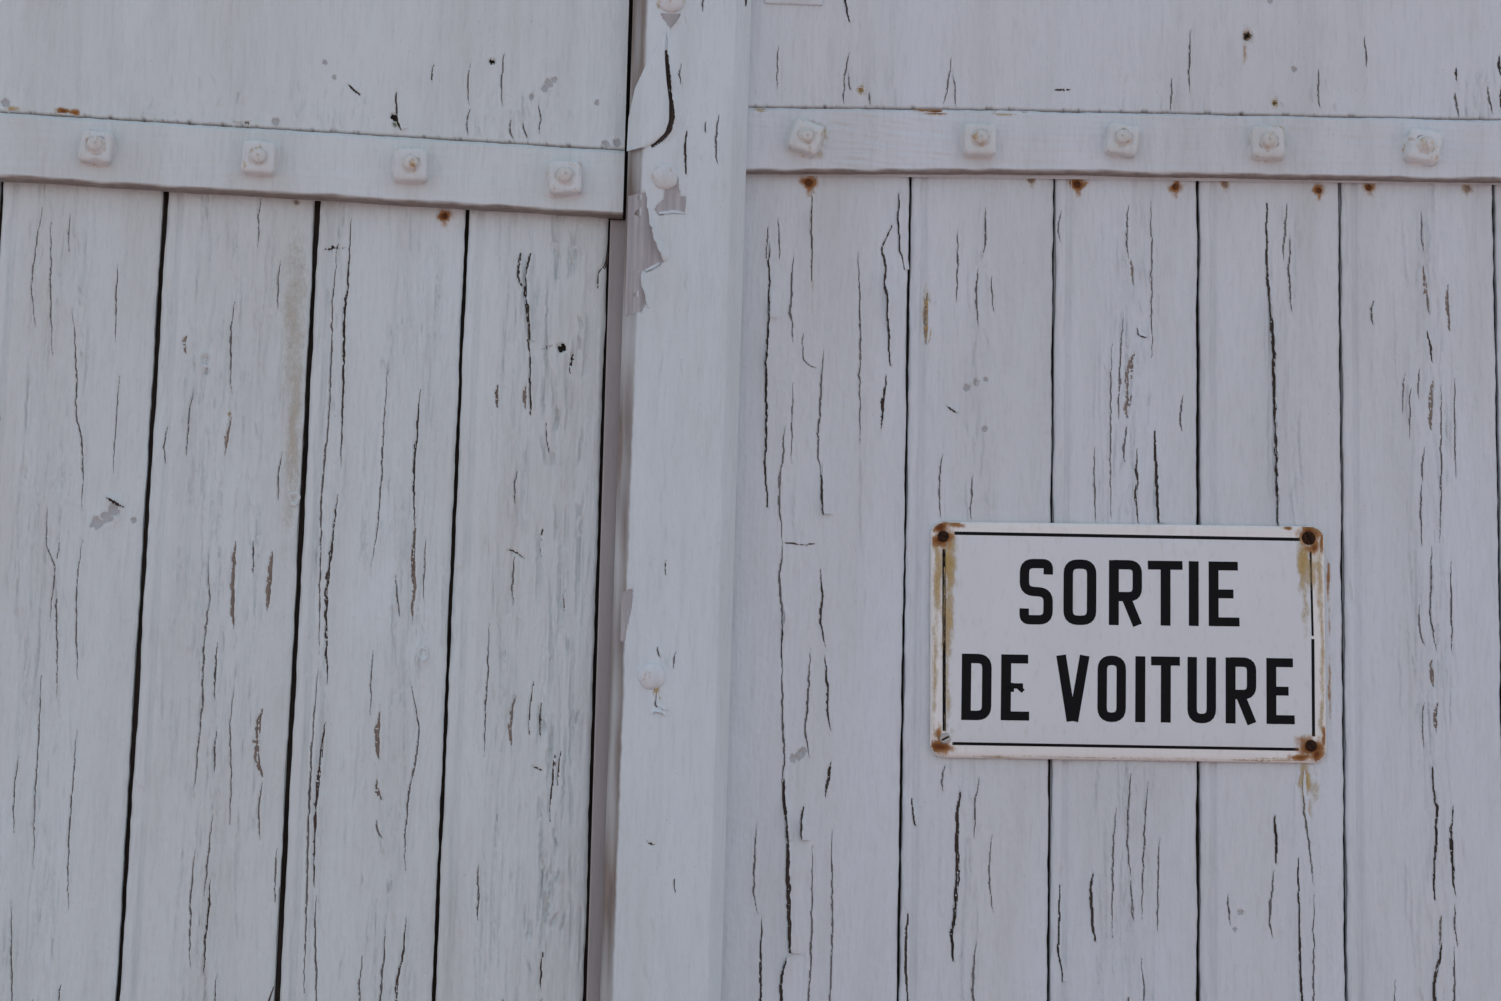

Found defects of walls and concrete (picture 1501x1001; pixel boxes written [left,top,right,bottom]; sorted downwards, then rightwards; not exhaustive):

peeling [602,10,690,316]
peeling [763,241,782,507]
corrosion [800,176,817,192]
peeling [881,193,909,366]
peeling [1265,203,1285,526]
crack [12,207,122,909]
crack [189,218,430,1001]
corrosion [931,729,953,754]
corrosion [932,522,964,709]
corrosion [1238,526,1331,762]
crack [10,907,65,1001]
peeling [779,746,812,1001]